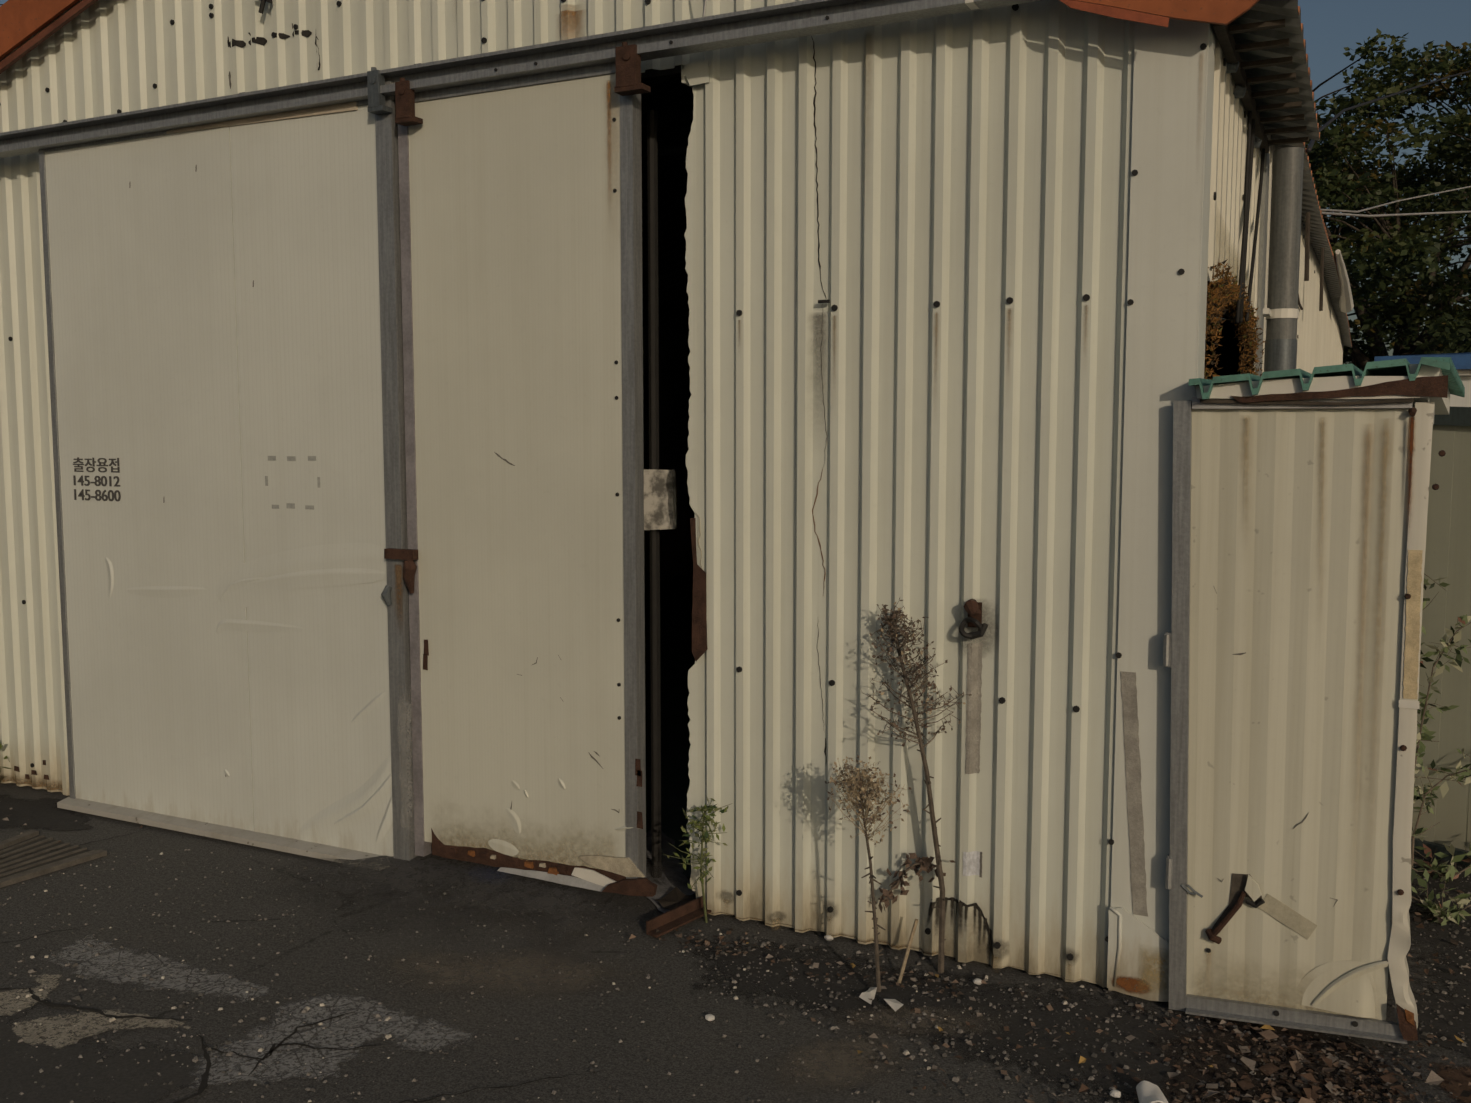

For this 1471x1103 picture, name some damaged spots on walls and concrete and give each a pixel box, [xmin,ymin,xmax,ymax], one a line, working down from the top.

crack [811,36,830,756]
rust [1408,407,1417,496]
rust [431,828,657,897]
leakage [928,897,994,966]